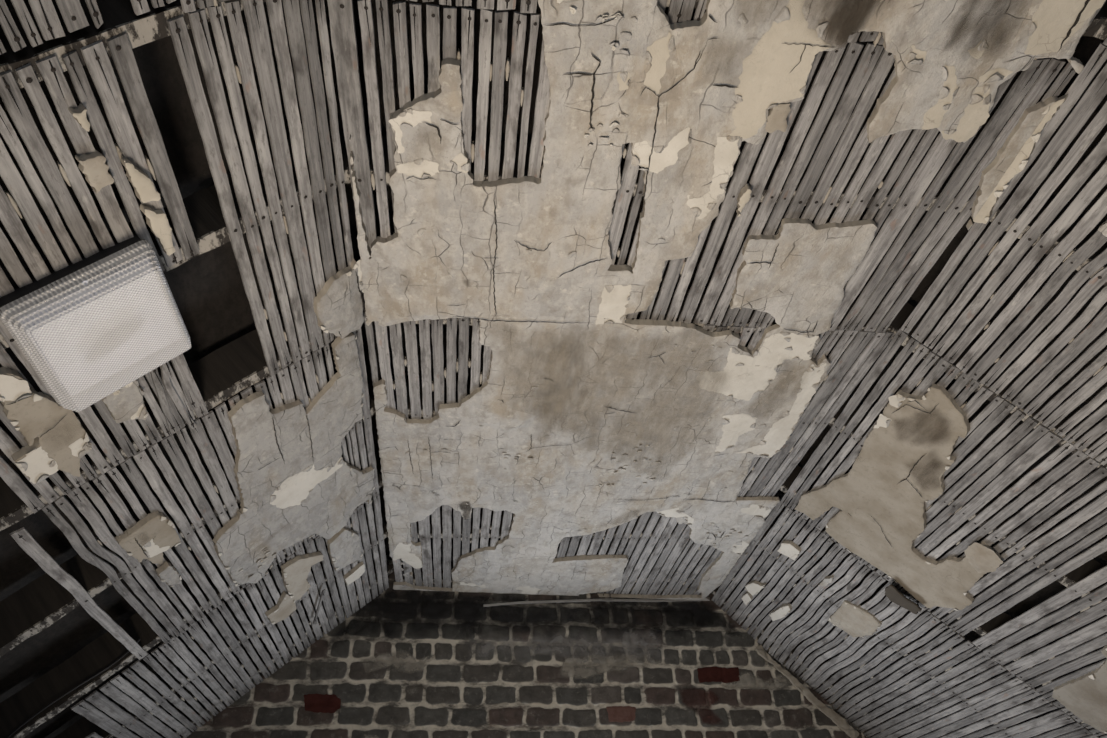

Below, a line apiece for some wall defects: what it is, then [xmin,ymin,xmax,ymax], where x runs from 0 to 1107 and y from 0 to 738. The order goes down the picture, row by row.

crack [564,53,601,130]
crack [547,14,619,26]
crack [640,15,739,212]
crack [782,43,834,69]
damp [826,0,875,45]
flaking render [0,0,550,738]
flaking render [554,0,1107,738]